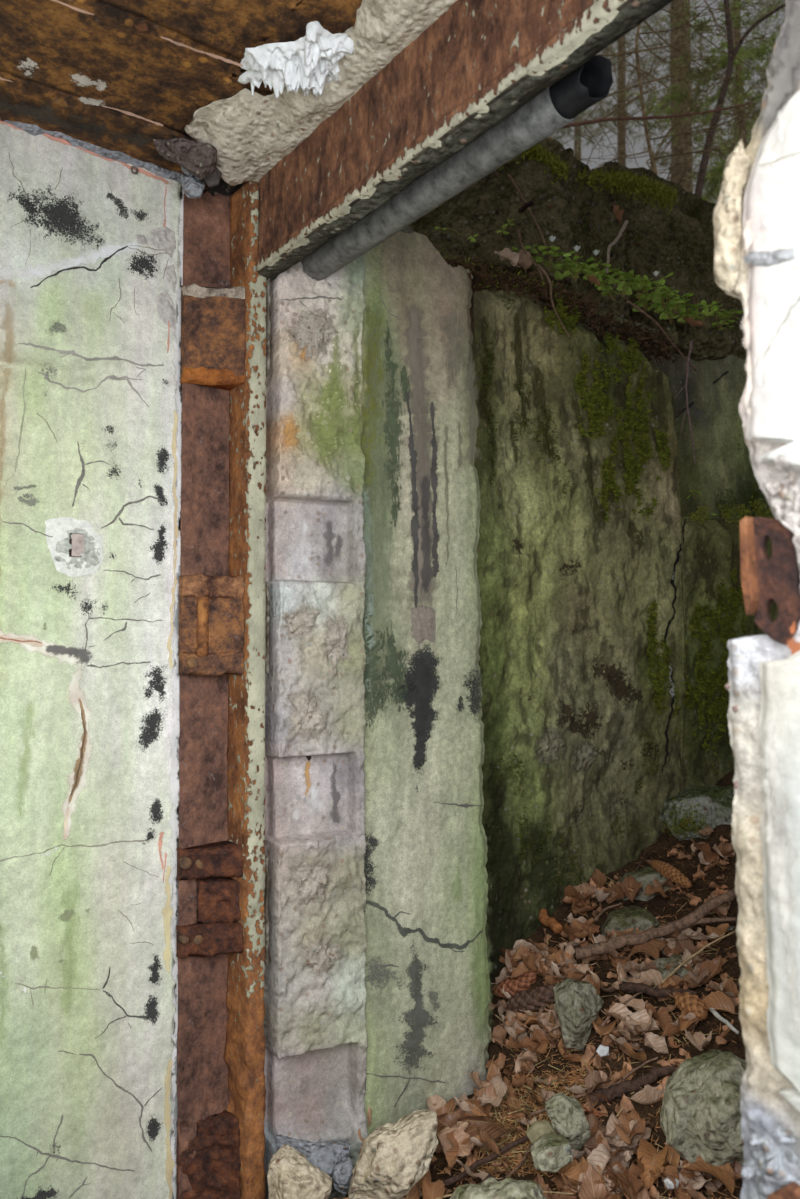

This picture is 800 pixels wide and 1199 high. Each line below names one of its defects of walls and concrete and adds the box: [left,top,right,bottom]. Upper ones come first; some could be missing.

damp [0,74,168,227]
damp [8,184,103,250]
spalling [44,517,103,577]
damp [352,306,494,608]
spalling [765,455,800,572]
damp [365,534,444,773]
crack [662,519,686,772]
corrosion [787,621,800,655]
corrosion [196,877,240,924]
crack [366,901,483,952]
damp [394,941,439,1076]
corrosion [176,1110,241,1199]